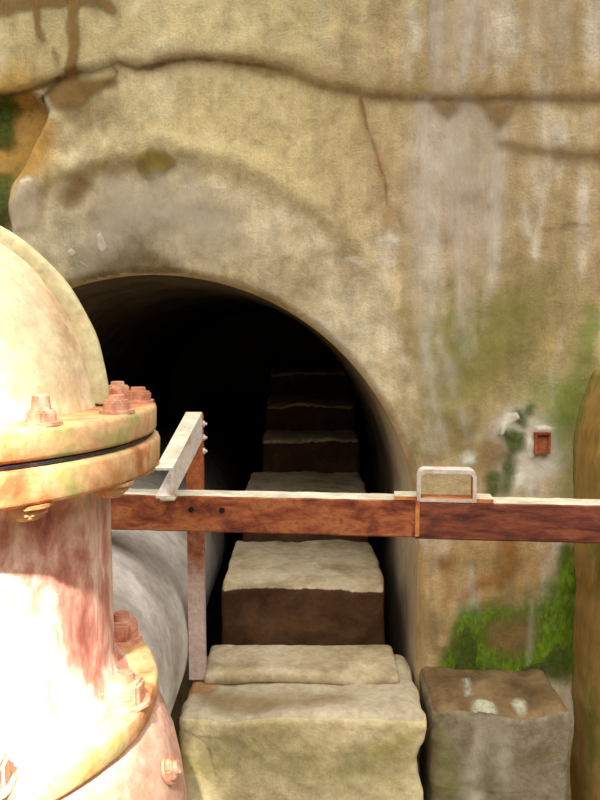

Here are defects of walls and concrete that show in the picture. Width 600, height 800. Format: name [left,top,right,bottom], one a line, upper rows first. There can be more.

leakage [0,0,116,107]
leakage [138,150,175,181]